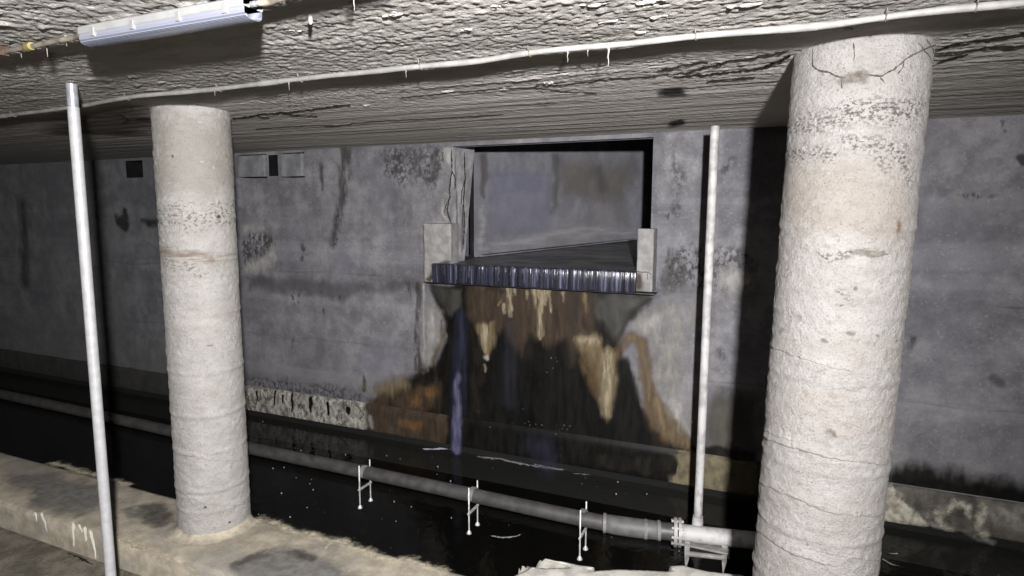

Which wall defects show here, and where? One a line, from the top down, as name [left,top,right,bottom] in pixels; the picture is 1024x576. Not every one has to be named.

crack [232,33,1024,129]
damp [333,147,350,245]
damp [384,150,444,183]
crack [444,150,466,246]
damp [242,226,276,272]
corrosion [468,285,595,354]
corrosion [363,378,448,444]
damp [386,278,759,497]
damp [890,465,1024,502]